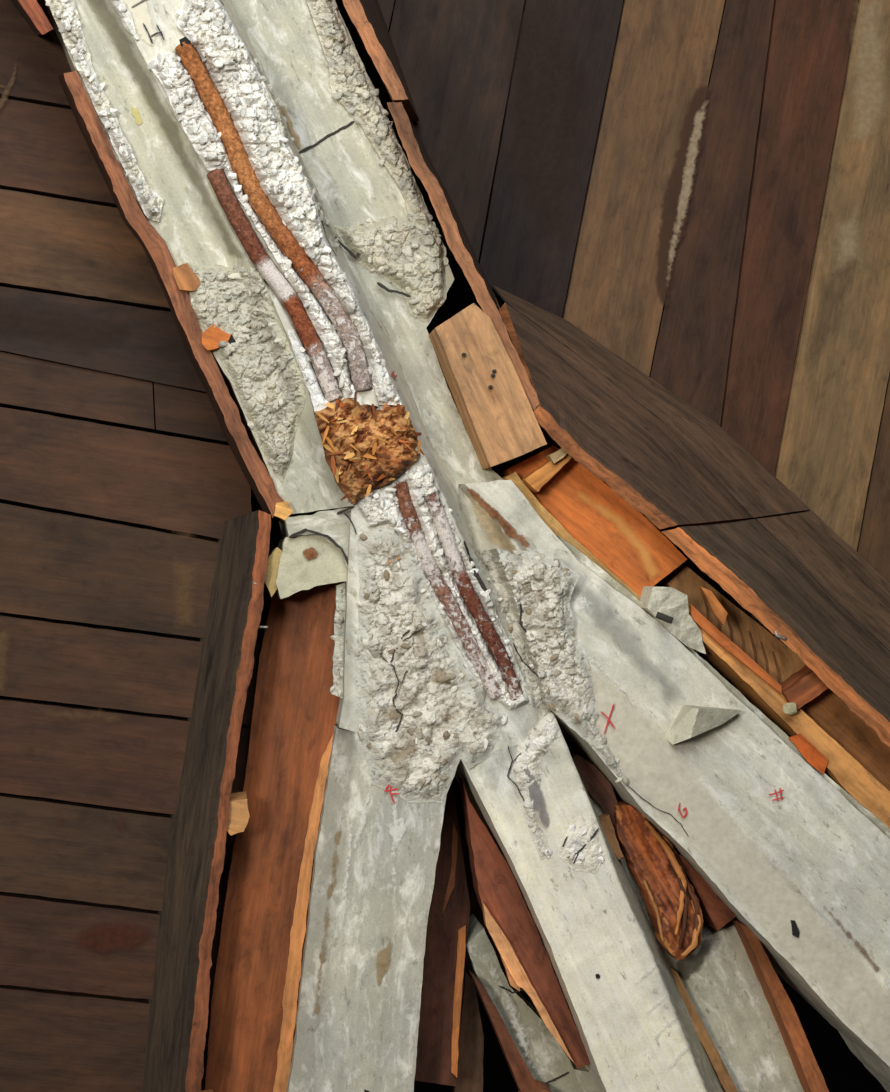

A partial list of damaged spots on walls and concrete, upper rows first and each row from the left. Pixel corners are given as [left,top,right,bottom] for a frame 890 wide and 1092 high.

spalling [108,0,139,40]
peeling [45,0,118,128]
peeling [119,145,137,181]
spalling [147,0,448,406]
spalling [183,261,328,482]
crack [289,506,357,564]
corrosion [467,488,530,548]
spalling [330,461,632,874]
crack [627,785,689,837]